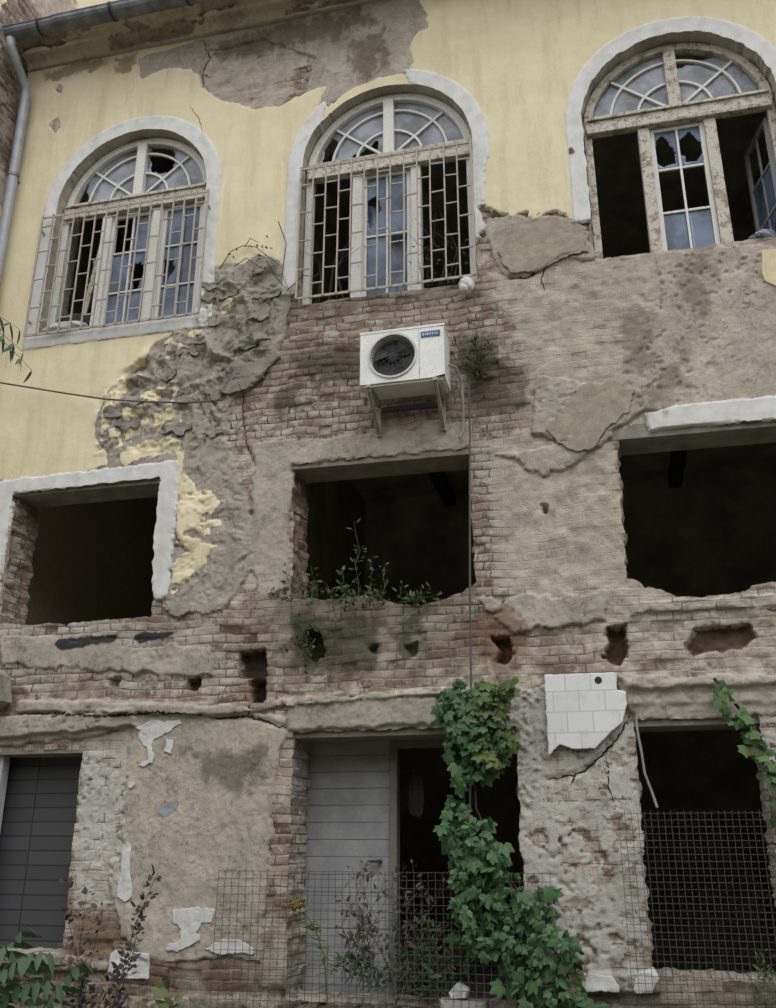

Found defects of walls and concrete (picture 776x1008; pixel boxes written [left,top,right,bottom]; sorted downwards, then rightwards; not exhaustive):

spalling [0,0,77,208]
spalling [107,0,428,110]
spalling [0,213,776,1008]
crack [548,715,631,801]